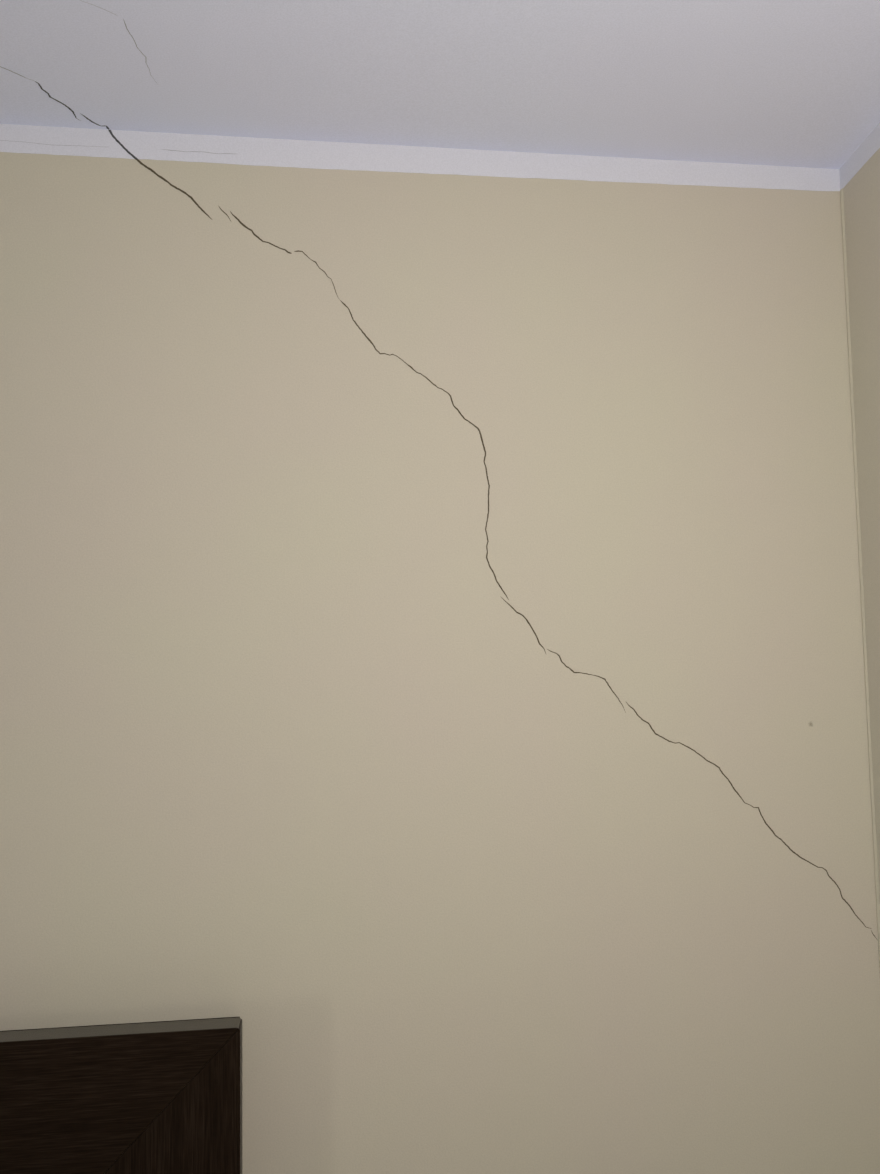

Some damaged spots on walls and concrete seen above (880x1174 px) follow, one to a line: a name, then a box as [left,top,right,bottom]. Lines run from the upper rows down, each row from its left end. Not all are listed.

crack [1,67,877,939]